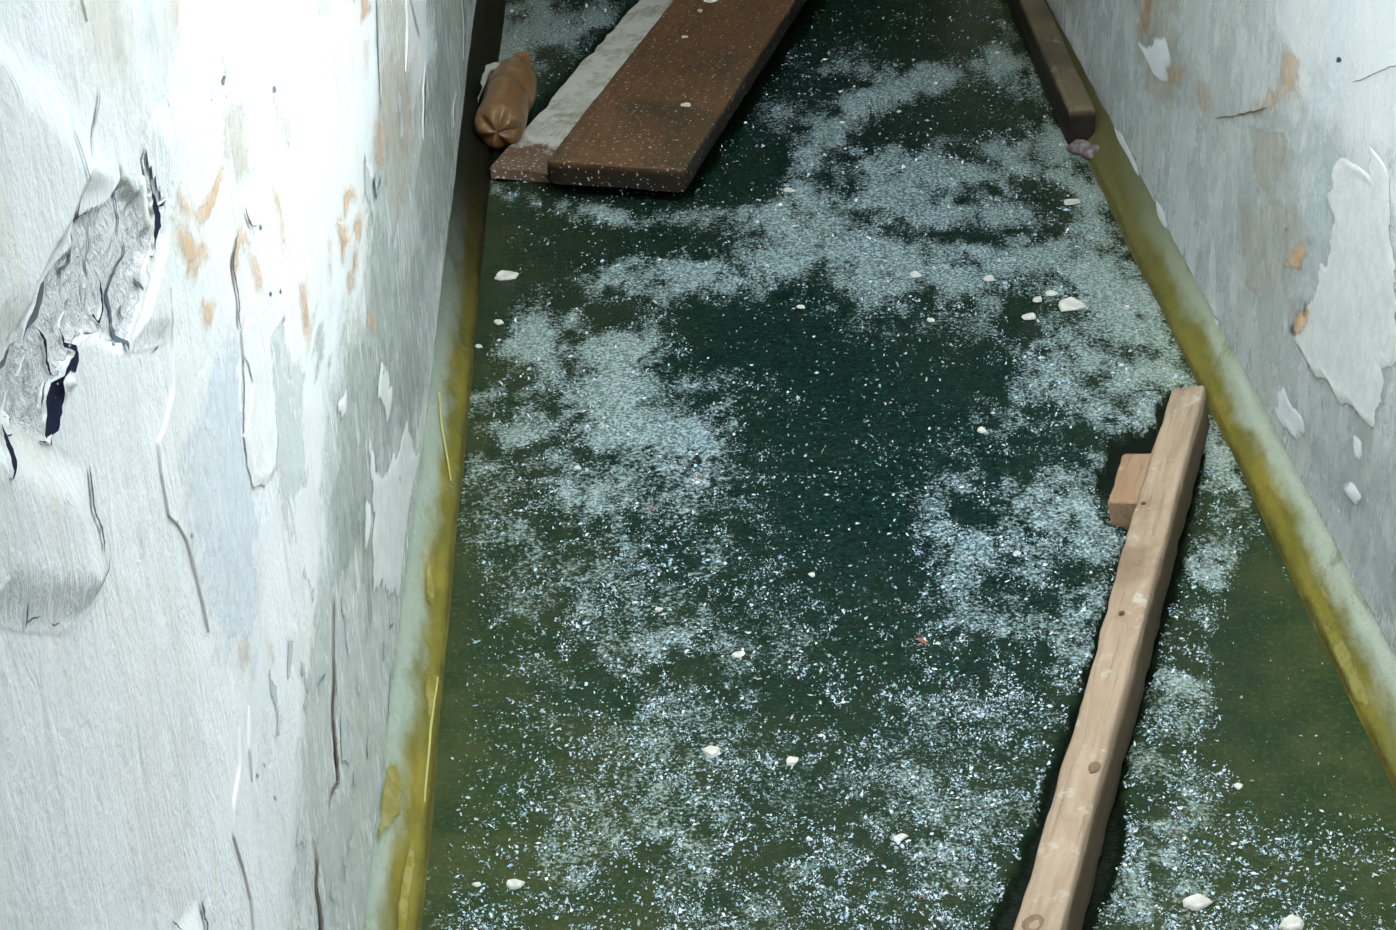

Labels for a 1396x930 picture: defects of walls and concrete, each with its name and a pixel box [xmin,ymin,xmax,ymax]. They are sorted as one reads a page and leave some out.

rust [199,174,222,221]
rust [339,190,361,289]
flaking render [0,151,163,441]
peeling [1292,145,1396,460]
peeling [1274,387,1305,441]
damp [302,0,467,930]
peeling [1337,482,1361,515]